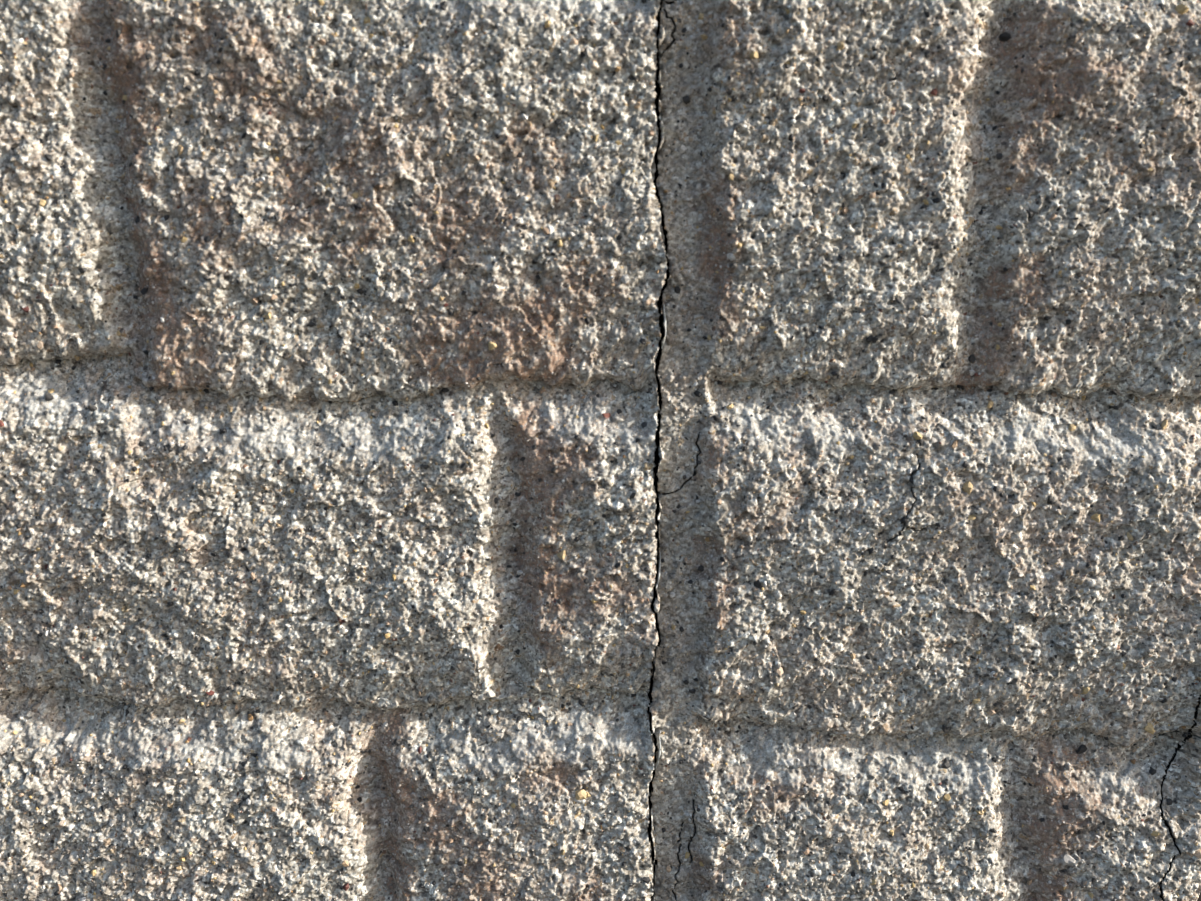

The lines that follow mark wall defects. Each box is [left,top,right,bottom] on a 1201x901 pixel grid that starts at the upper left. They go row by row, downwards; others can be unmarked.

crack [647,0,701,901]
crack [1153,695,1201,901]